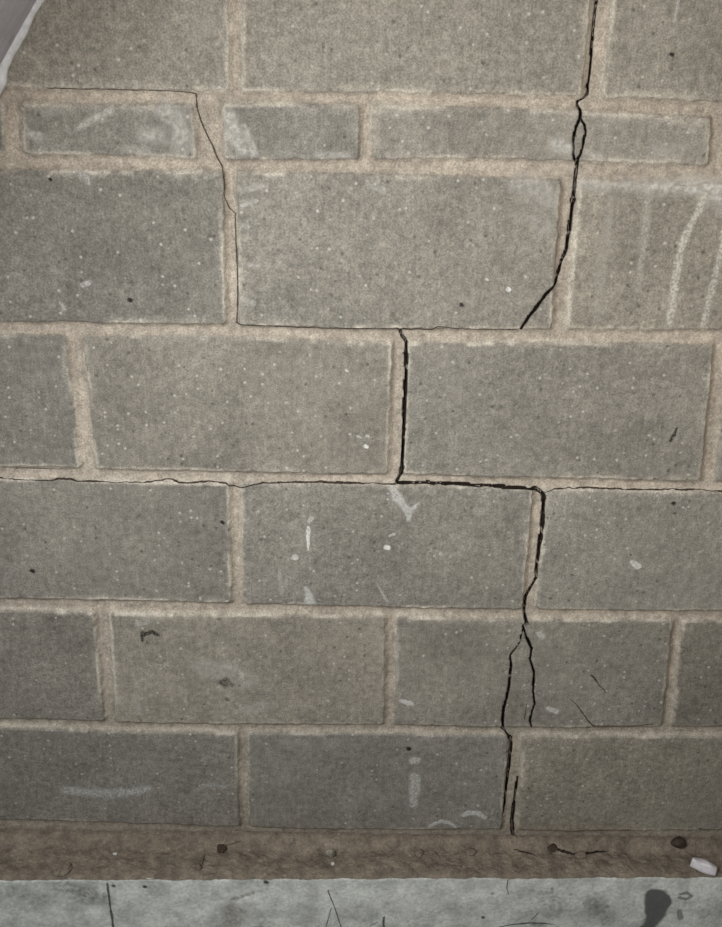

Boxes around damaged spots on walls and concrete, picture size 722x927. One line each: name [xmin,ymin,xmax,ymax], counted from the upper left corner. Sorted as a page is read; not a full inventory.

crack [49,88,238,271]
crack [473,1,597,330]
crack [0,286,722,855]